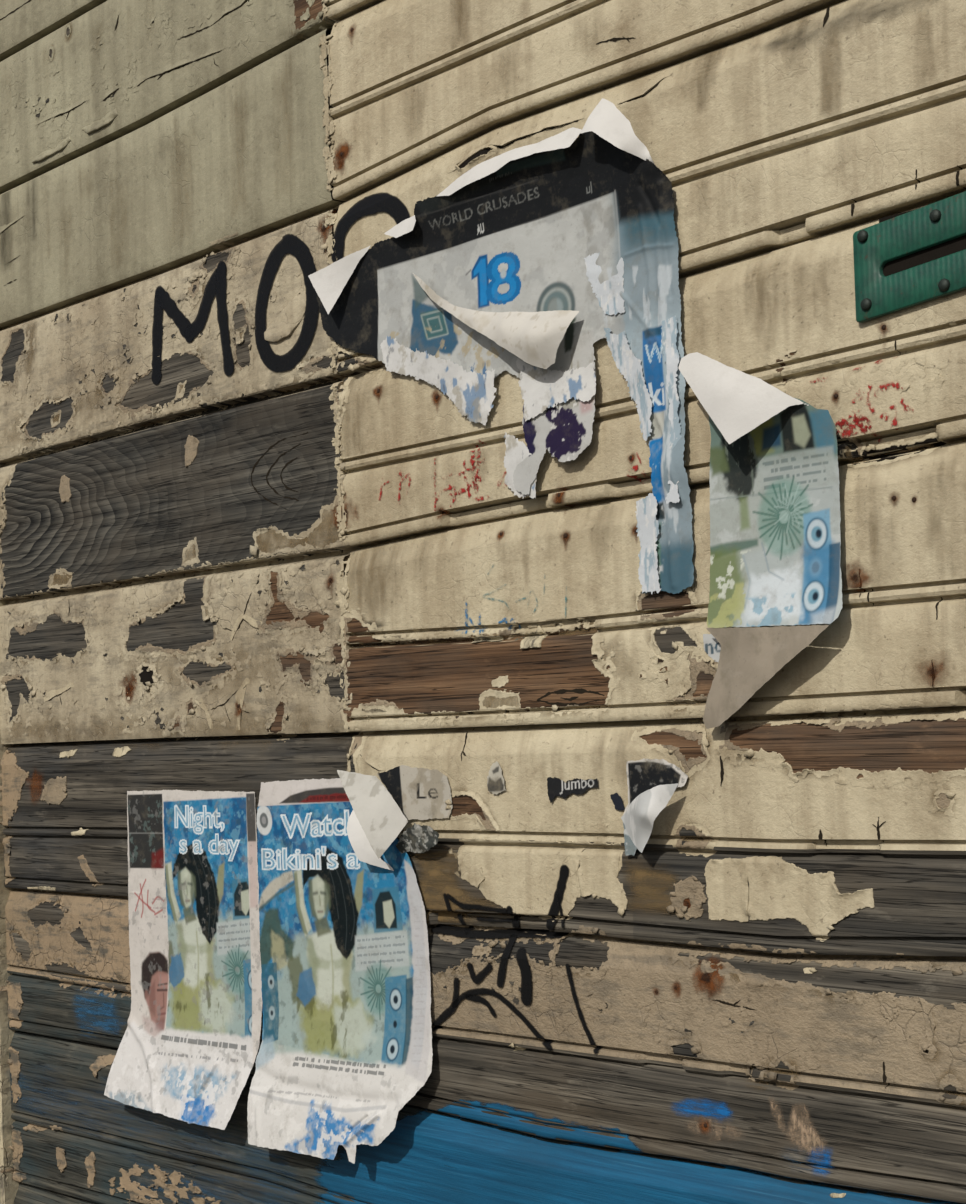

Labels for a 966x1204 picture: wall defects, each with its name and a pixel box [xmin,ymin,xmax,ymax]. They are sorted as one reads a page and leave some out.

crack [34,0,248,126]
peeling [287,0,336,42]
peeling [0,212,966,819]
peeling [416,791,625,894]
peeling [7,890,131,998]
peeling [427,924,623,1048]
corrosion [695,959,723,996]
peeling [660,925,966,1024]
peeling [668,1038,709,1068]
peeling [745,1053,799,1090]
peeling [936,1073,966,1105]